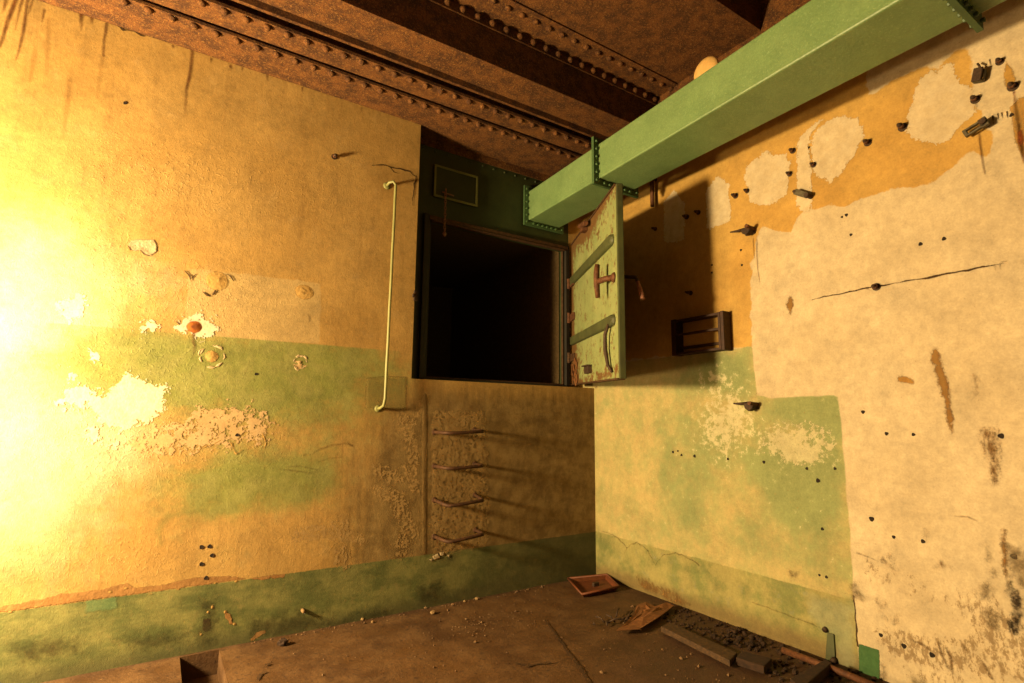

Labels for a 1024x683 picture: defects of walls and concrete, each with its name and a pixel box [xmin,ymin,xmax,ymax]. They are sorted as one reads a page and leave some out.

peeling [904,62,977,146]
peeling [743,115,865,212]
flaking render [128,239,156,256]
crack [813,265,993,300]
peeling [55,291,89,325]
peeling [132,319,161,333]
peeling [54,366,279,461]